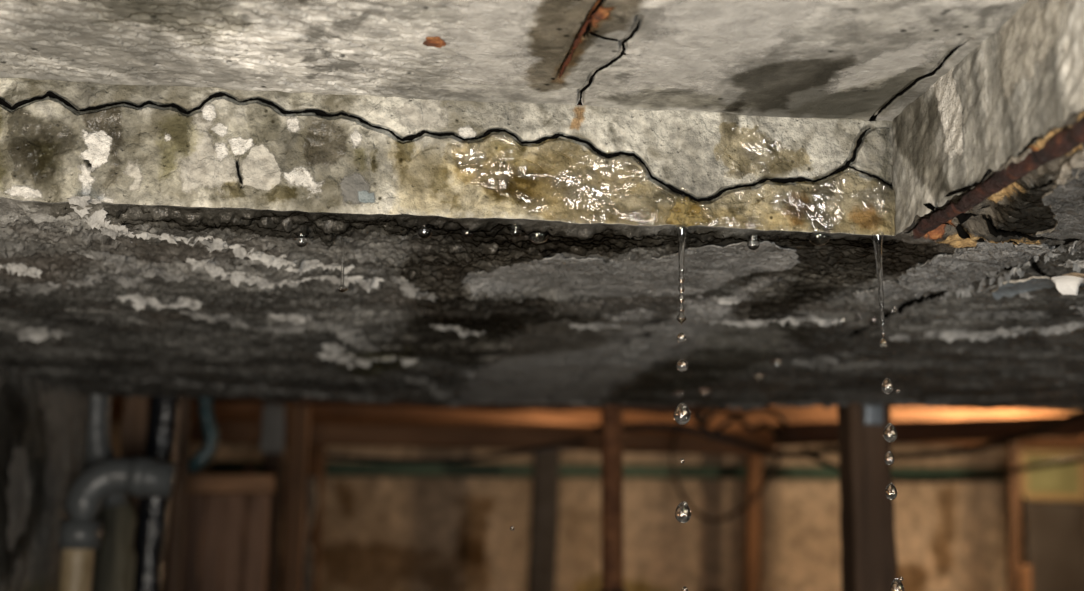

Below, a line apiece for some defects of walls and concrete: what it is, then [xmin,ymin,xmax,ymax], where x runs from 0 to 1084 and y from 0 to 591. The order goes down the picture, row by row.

damp [624,0,817,91]
damp [831,36,947,92]
efflorescence [79,130,114,203]
crack [0,0,970,202]
peeling [853,109,1084,343]
corrosion [924,219,1040,248]
crack [905,211,1080,283]
corrosion [988,181,1022,203]
corrosion [1027,112,1084,152]
peeling [0,196,453,401]
crack [827,290,948,357]
flaking render [0,376,82,591]